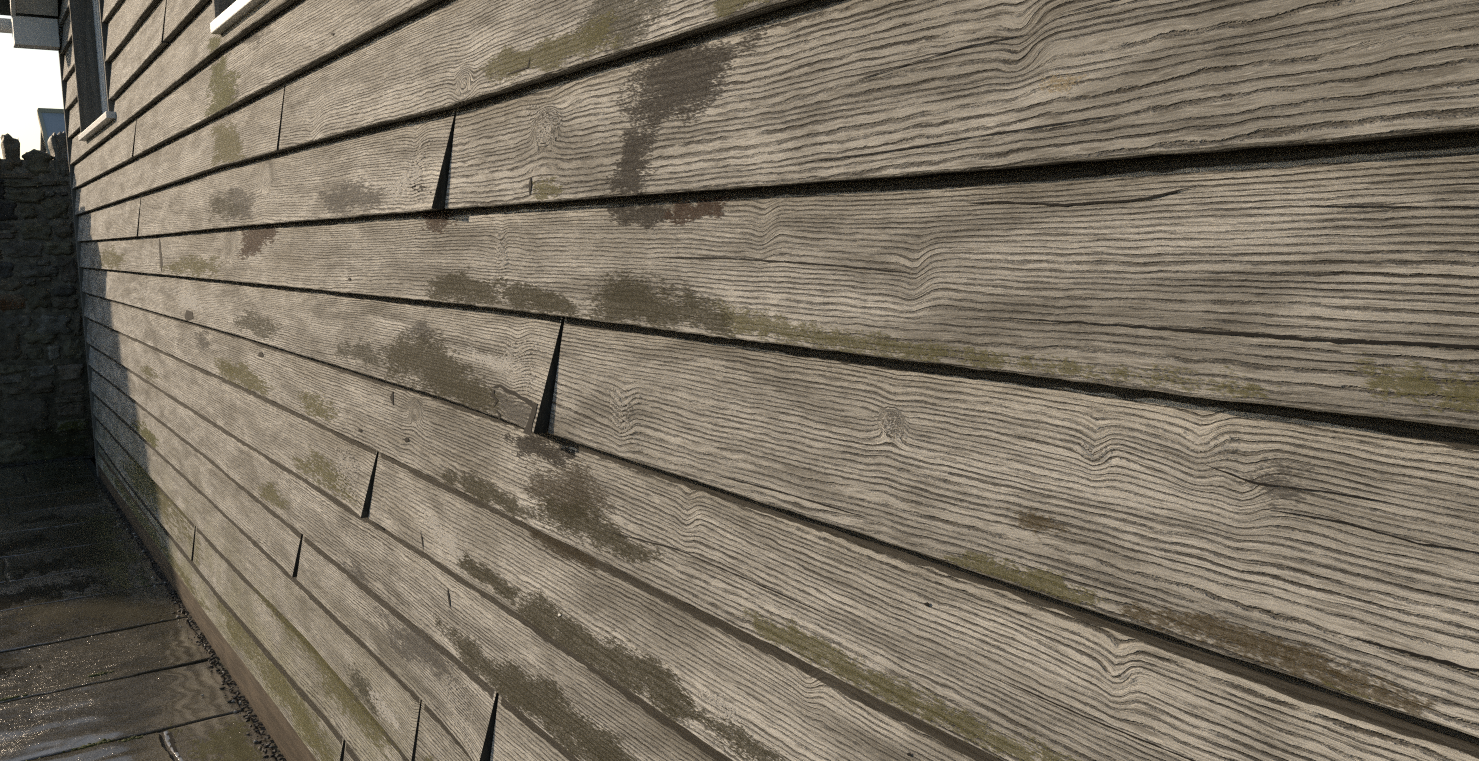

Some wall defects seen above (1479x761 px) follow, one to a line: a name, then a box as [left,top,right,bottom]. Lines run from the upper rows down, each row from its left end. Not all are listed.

leakage [602,16,789,231]
leakage [503,431,579,468]